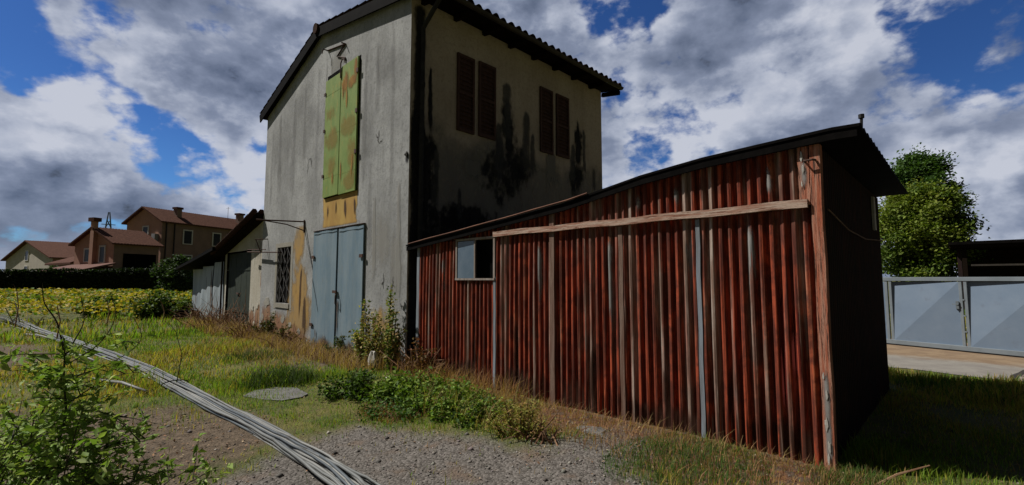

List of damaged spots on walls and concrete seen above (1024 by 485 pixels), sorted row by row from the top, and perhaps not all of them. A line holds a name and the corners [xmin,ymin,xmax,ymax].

water stain [372,6,602,364]
rust [780,298,801,404]
rust [563,353,812,462]